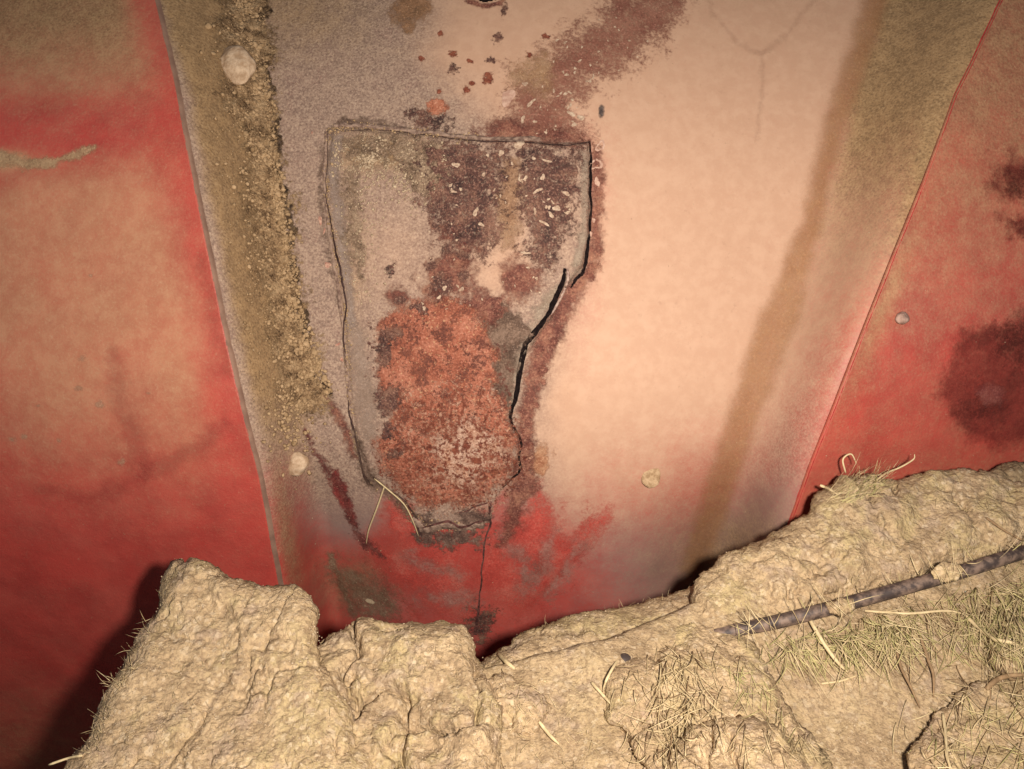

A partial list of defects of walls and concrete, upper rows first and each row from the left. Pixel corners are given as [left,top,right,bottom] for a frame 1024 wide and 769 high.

peeling [486,82,585,226]
peeling [592,140,605,187]
rust [321,0,685,552]
crack [318,117,593,635]
rust [304,429,386,558]
rust [464,597,499,655]